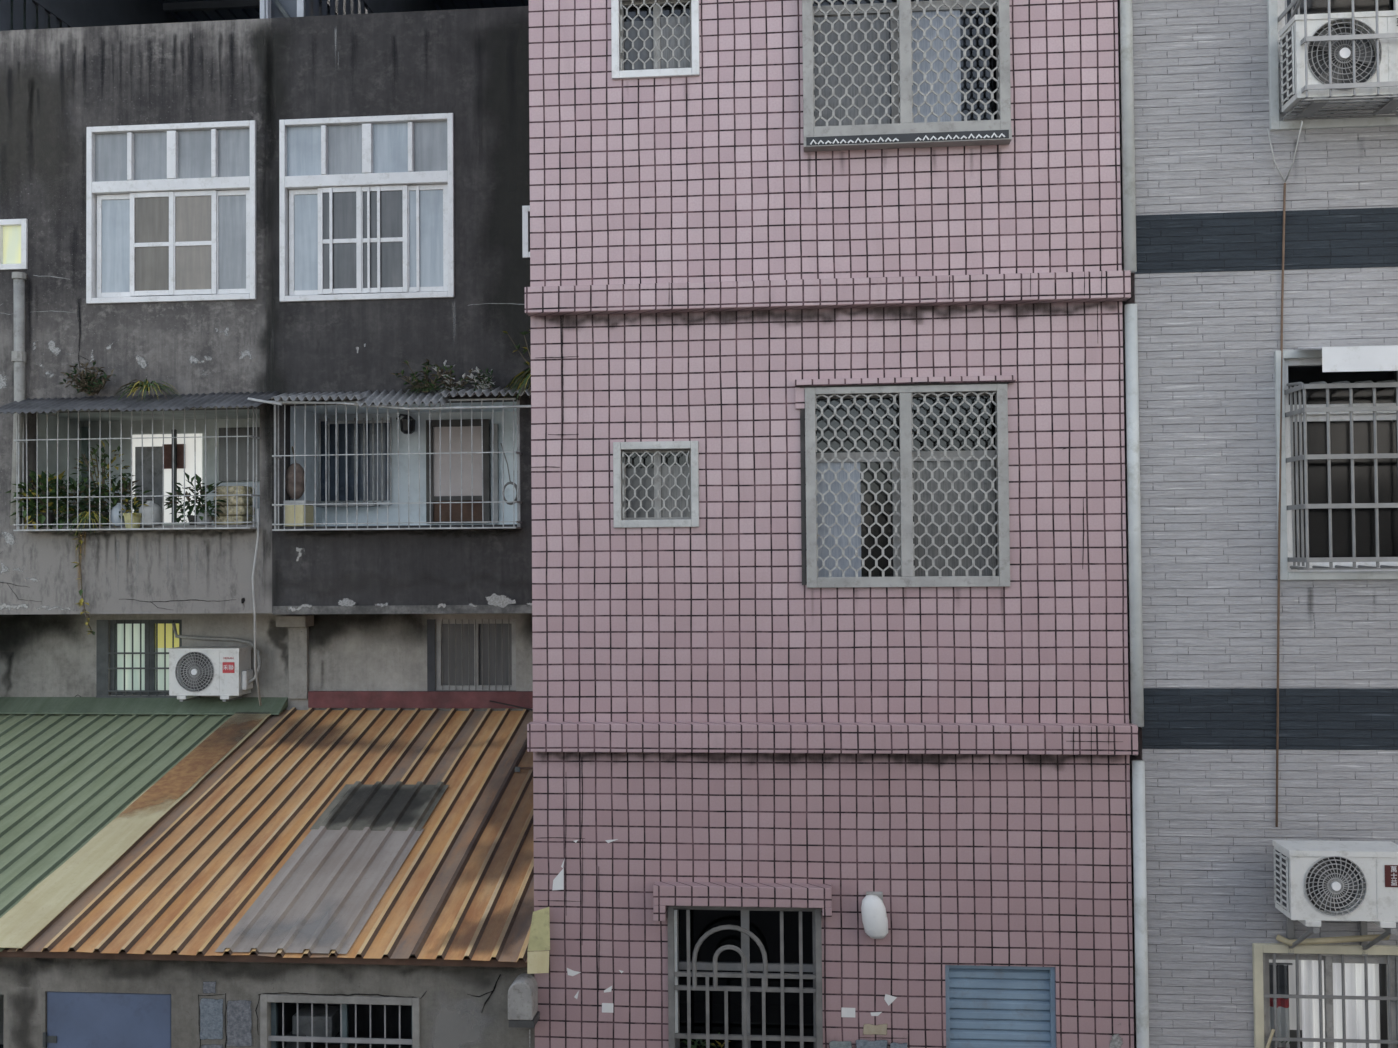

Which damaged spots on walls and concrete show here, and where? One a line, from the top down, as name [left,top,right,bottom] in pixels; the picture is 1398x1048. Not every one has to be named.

water stain [173,34,233,74]
spalling [338,598,356,608]
spalling [469,593,532,608]